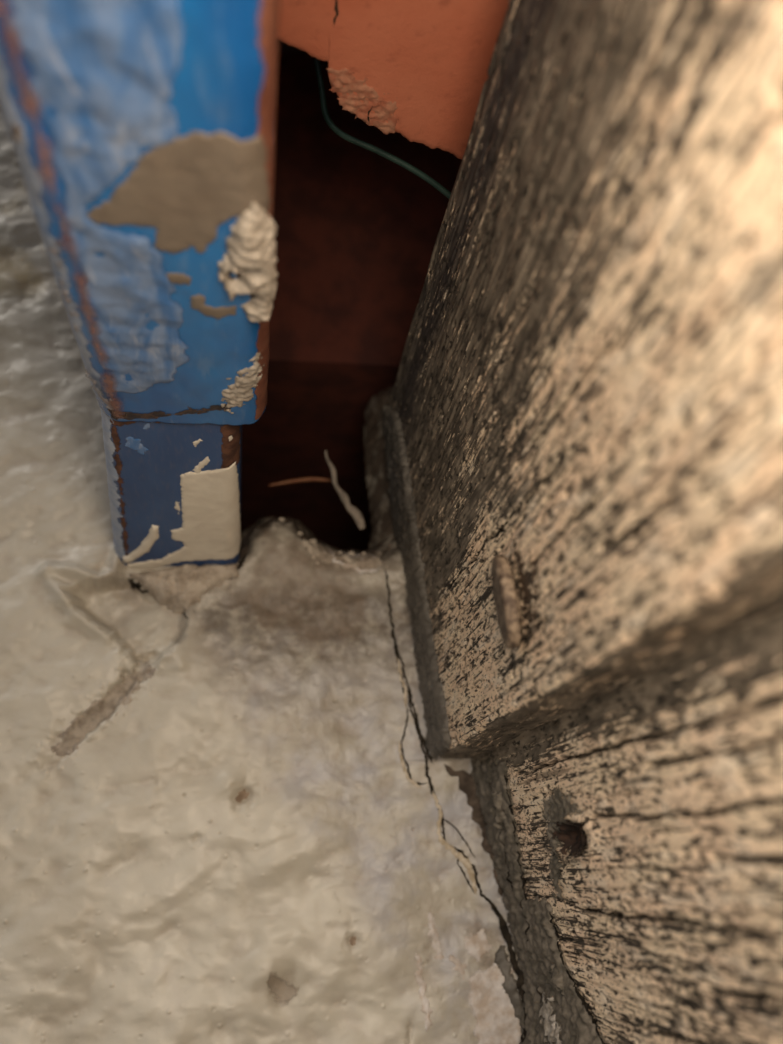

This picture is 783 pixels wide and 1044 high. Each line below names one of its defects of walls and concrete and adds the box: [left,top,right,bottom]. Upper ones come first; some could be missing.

spalling [326,68,399,135]
corrosion [75,275,232,564]
peeling [221,350,265,414]
crack [385,570,544,1044]